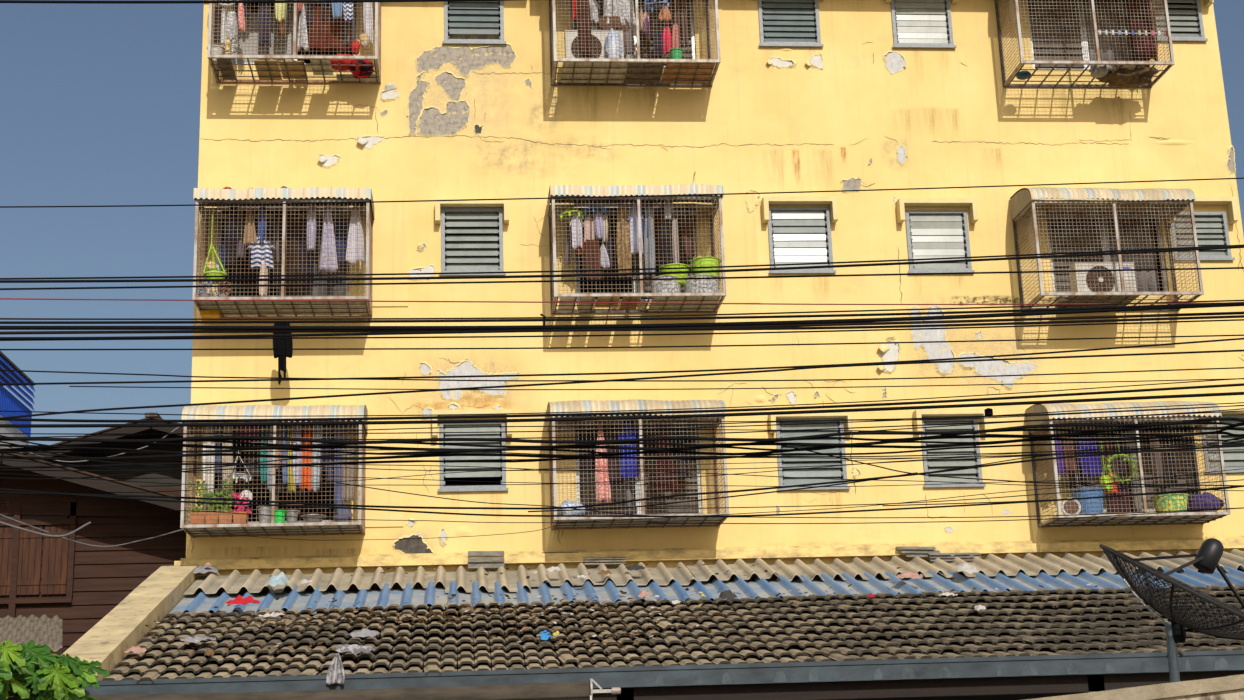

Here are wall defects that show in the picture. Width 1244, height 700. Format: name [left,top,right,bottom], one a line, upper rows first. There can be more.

peeling [767,53,824,70]
peeling [882,50,907,75]
peeling [379,43,517,138]
peeling [357,135,385,150]
peeling [317,153,341,169]
peeling [877,305,1039,399]
peeling [419,359,521,420]
peeling [392,518,449,554]